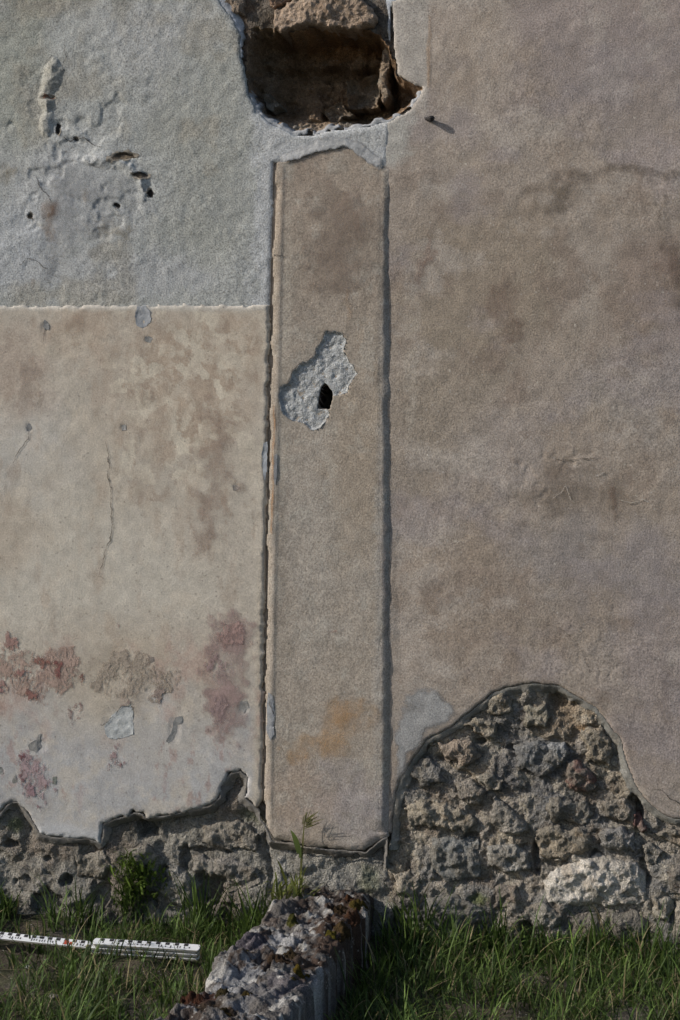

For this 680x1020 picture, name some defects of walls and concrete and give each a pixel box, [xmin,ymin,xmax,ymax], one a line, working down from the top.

spalling [219,0,423,136]
spalling [279,331,358,431]
crack [100,449,113,569]
spalling [0,683,680,955]